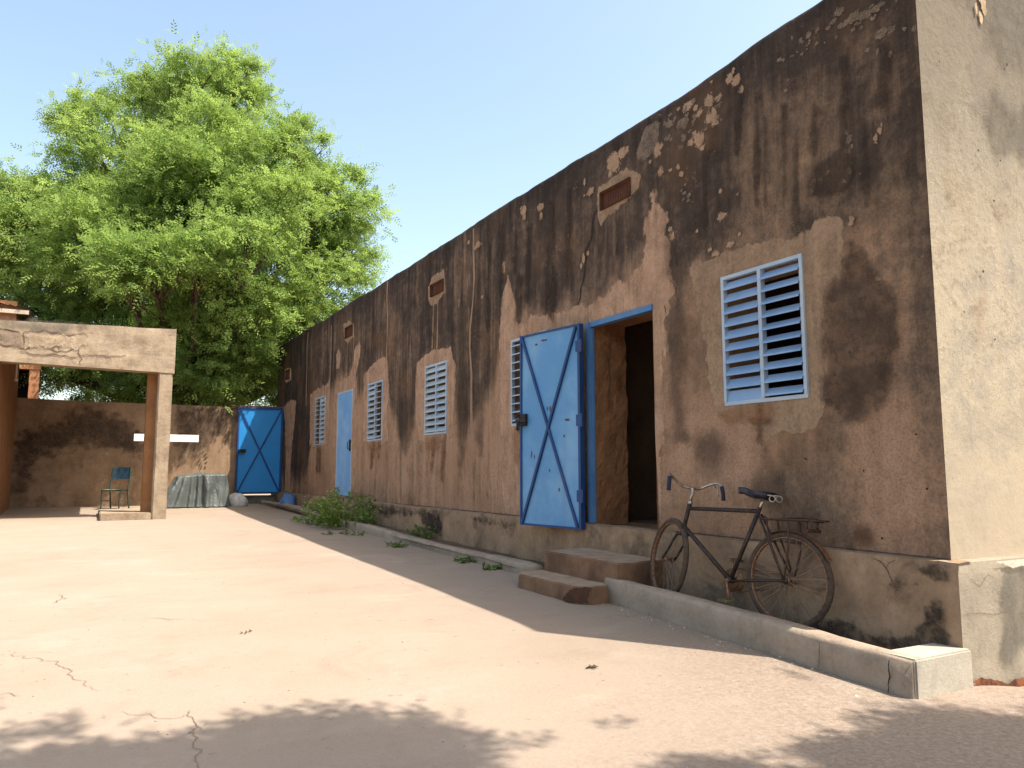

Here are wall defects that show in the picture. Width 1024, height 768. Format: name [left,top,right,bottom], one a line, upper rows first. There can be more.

flaking render [777,2,916,62]
flaking render [648,67,744,202]
water stain [781,56,870,207]
crack [577,210,598,305]
crack [0,328,126,365]
water stain [822,244,898,421]
water stain [11,408,141,493]
water stain [918,564,948,582]
water stain [814,602,948,650]